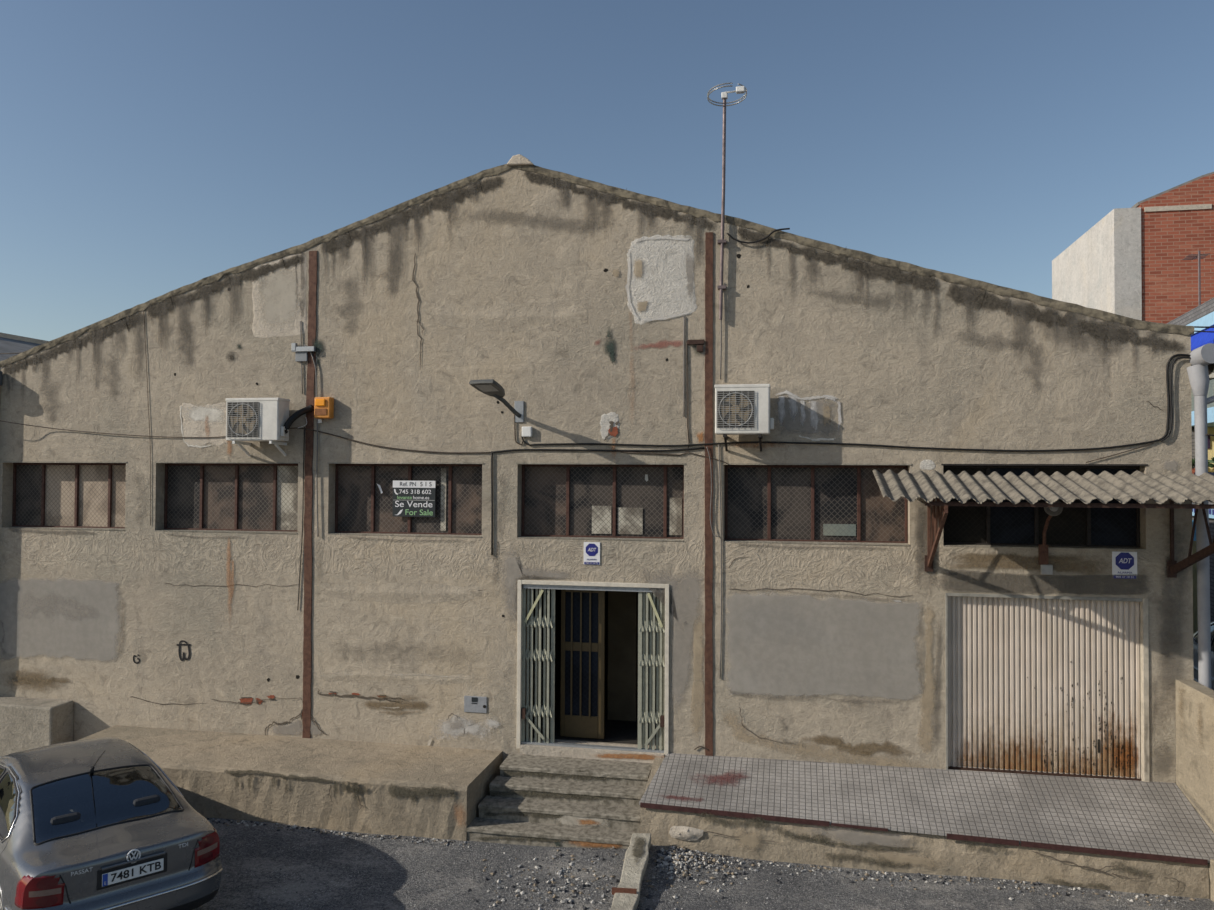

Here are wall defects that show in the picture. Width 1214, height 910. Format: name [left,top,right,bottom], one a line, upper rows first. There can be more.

leakage [322,177,502,269]
leakage [524,170,712,246]
leakage [4,252,303,385]
crack [412,253,424,367]
leakage [737,228,1184,357]
flaking render [600,412,620,450]
flaking render [238,695,276,705]
crack [131,689,407,735]
rust [960,718,1138,777]